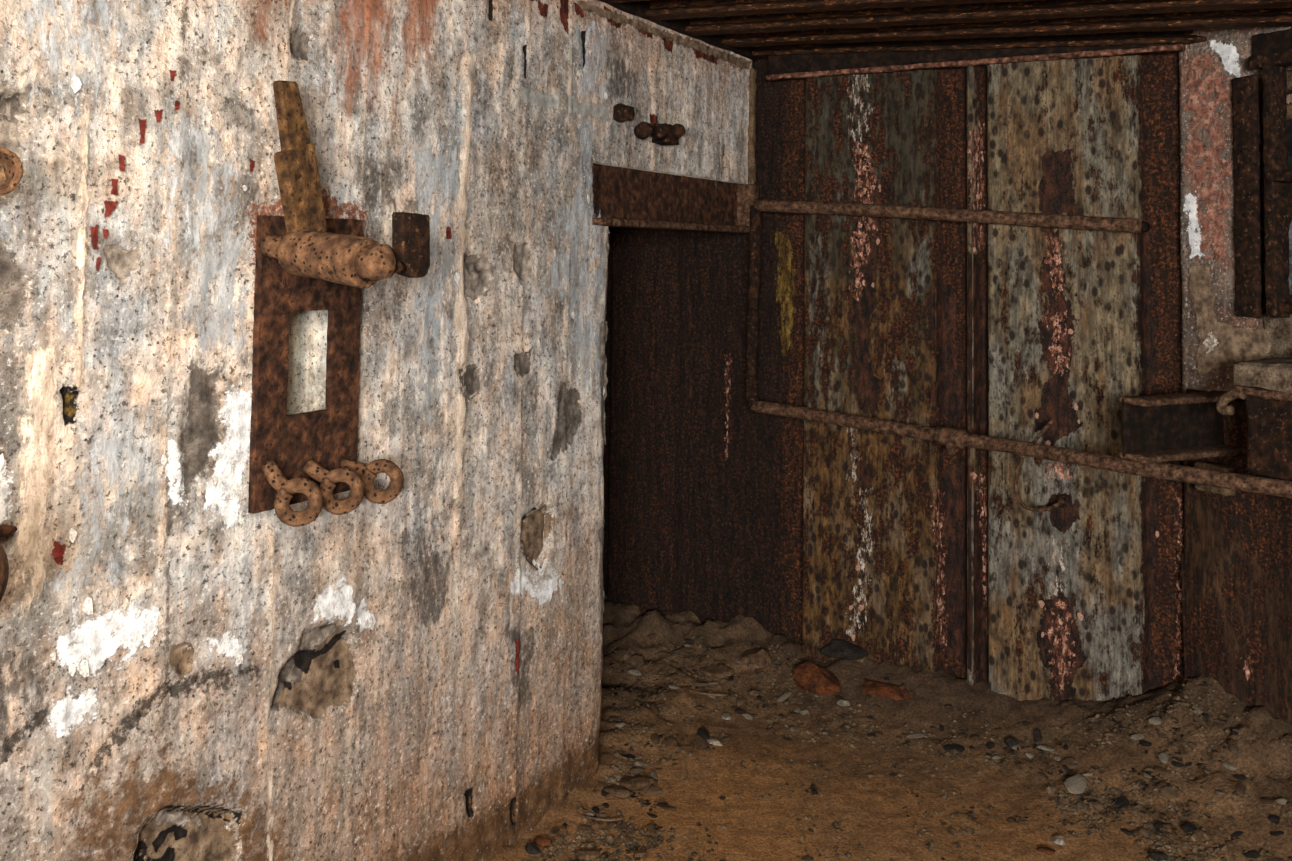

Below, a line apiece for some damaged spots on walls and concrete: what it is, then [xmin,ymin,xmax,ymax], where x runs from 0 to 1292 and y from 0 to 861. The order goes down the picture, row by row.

peeling [0,0,159,207]
rust [340,0,436,115]
spalling [0,240,33,338]
peeling [1183,40,1272,375]
peeling [0,453,18,524]
peeling [44,97,258,738]
rust [1032,149,1087,701]
spalling [272,576,376,725]